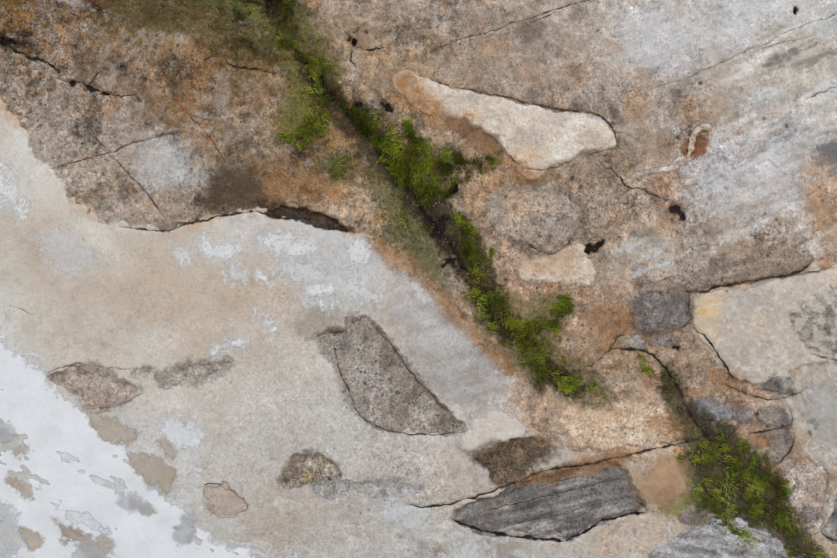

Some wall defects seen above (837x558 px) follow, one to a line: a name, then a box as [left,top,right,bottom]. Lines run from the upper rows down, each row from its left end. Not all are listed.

crack [0,34,136,104]
crack [441,0,589,48]
crack [644,13,837,91]
crack [49,97,355,233]
flaking render [392,70,617,180]
peeling [304,279,339,315]
flaking render [517,243,596,286]
flaking render [690,264,837,385]
peeling [0,335,255,558]
spalling [278,451,422,501]
spalling [316,316,645,541]
spalling [783,458,837,544]